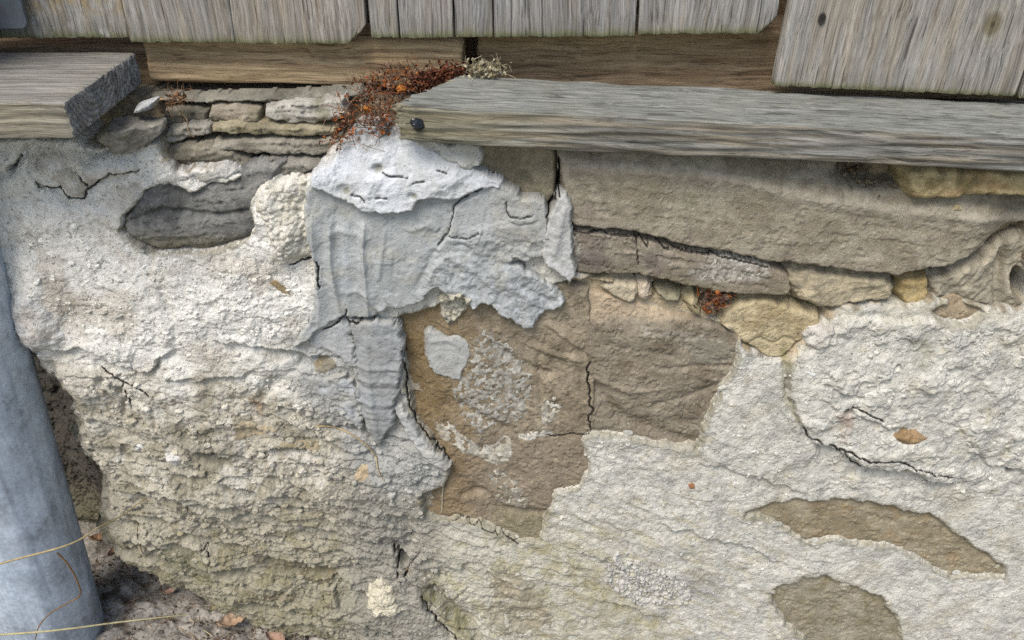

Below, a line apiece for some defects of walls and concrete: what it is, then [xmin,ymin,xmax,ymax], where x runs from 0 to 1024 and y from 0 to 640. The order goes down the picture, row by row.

crack [35,171,137,199]
spalling [124,152,288,250]
crack [573,228,769,268]
spalling [399,181,743,538]
crack [544,361,594,437]
crack [803,427,954,478]
spalling [755,493,1004,575]
spalling [767,575,902,640]